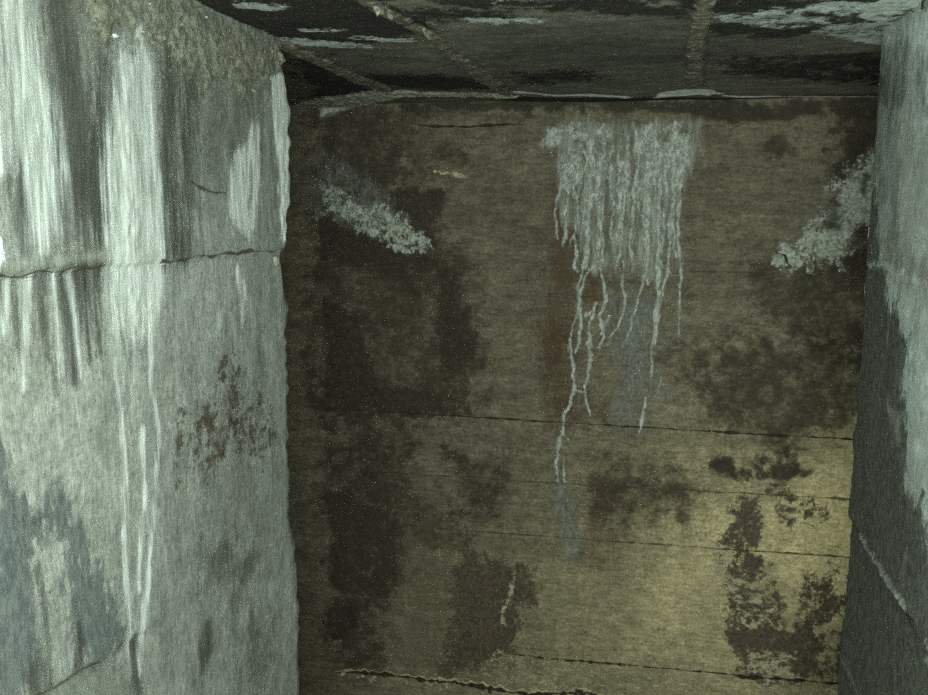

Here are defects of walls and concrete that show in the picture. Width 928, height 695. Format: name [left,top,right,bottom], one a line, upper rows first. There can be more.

water stain [196,0,699,44]
water stain [0,0,198,695]
water stain [283,0,928,695]
water stain [201,622,210,672]
crack [335,649,702,695]
crack [752,655,858,695]